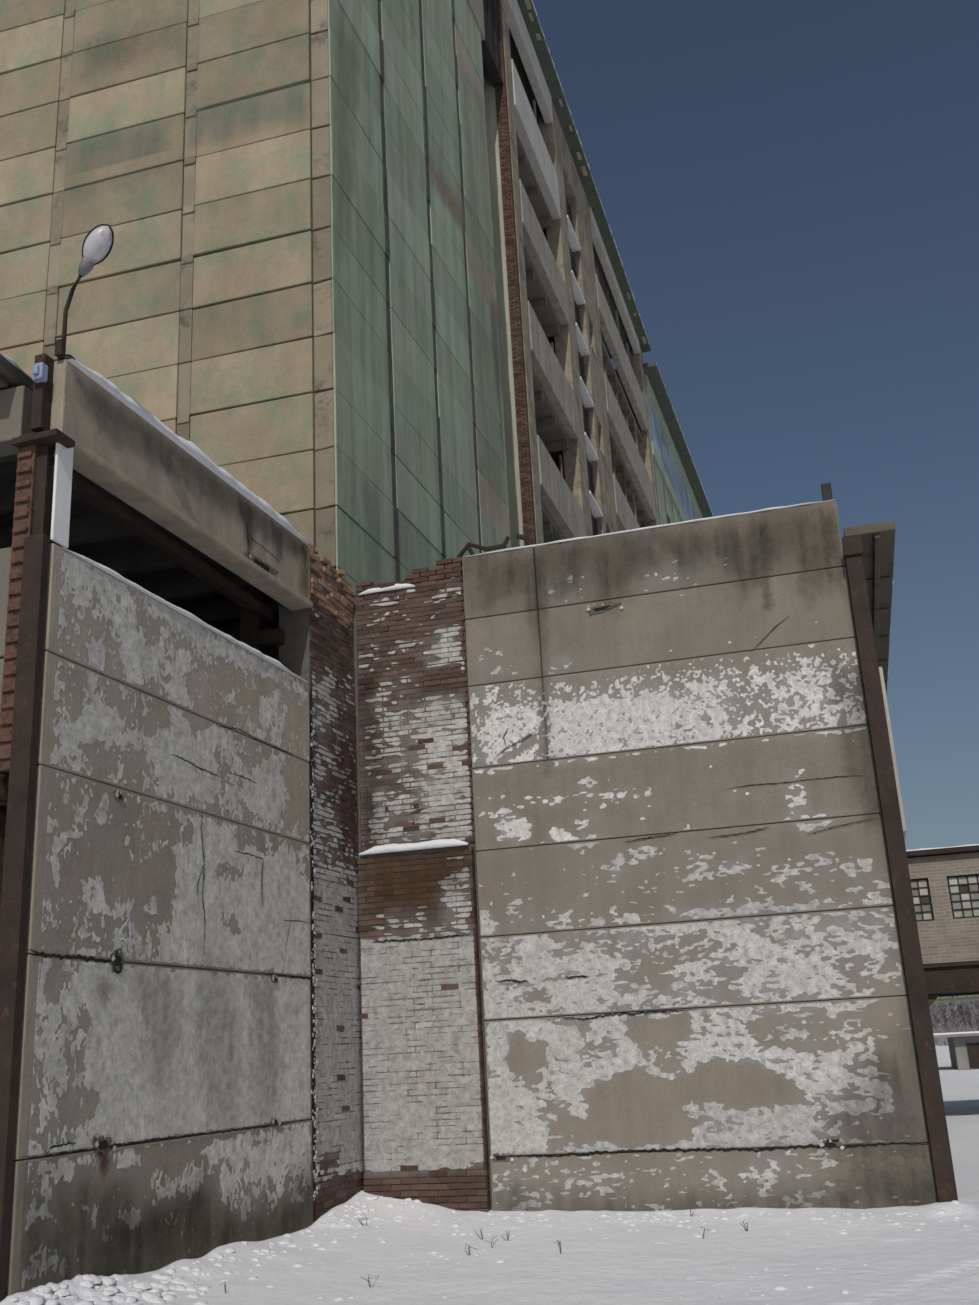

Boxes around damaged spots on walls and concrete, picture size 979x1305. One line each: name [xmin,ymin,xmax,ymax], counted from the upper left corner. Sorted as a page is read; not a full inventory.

crack [170,754,258,784]
crack [220,726,293,755]
crack [197,823,205,942]
crack [236,851,313,981]
peeling [22,552,910,1288]